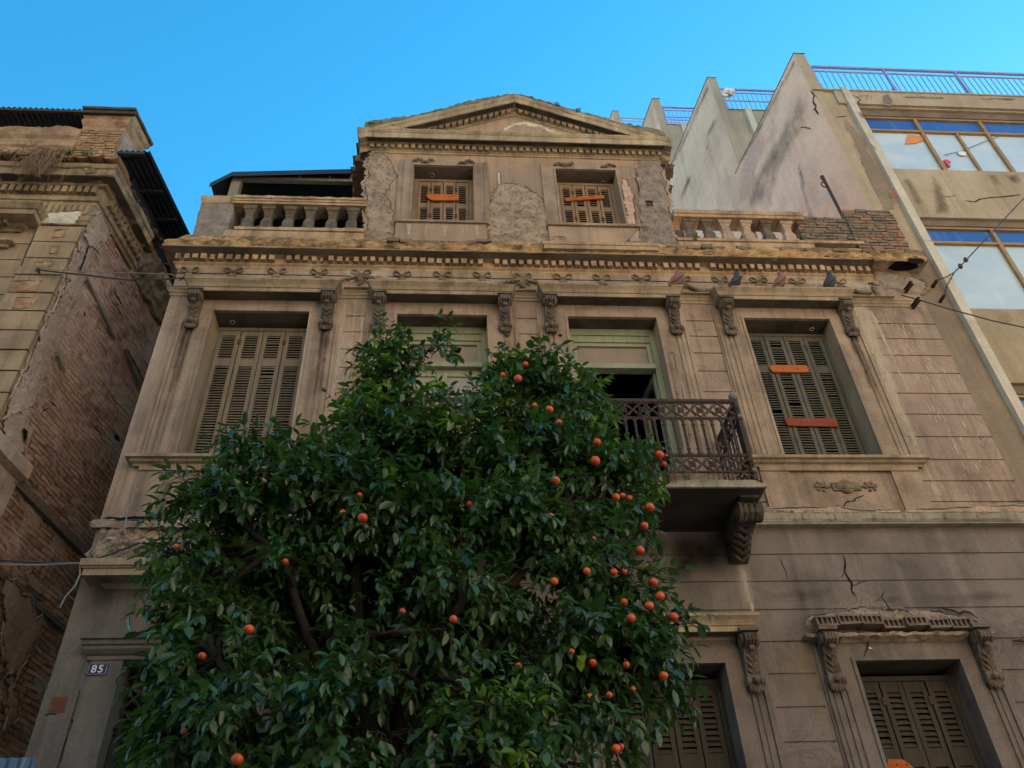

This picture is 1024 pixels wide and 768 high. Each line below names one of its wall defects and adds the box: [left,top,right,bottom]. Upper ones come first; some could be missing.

crack [800,91,872,129]
flaking render [361,152,399,239]
flaking render [487,171,567,243]
flaking render [620,159,678,245]
flaking render [3,210,111,454]
flaking render [84,516,169,558]
crack [841,556,912,615]
crack [939,607,979,619]
flaking render [0,574,43,736]